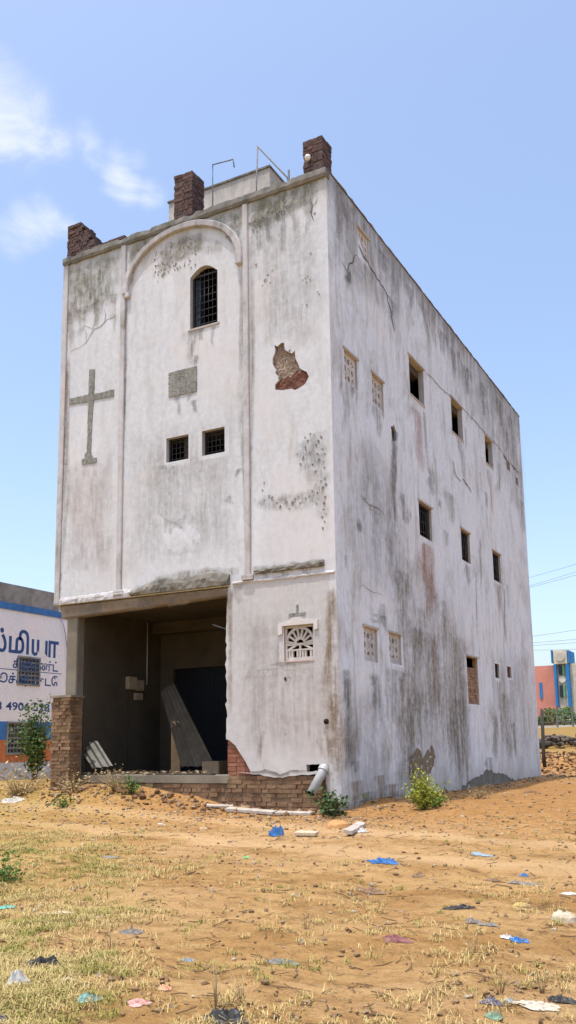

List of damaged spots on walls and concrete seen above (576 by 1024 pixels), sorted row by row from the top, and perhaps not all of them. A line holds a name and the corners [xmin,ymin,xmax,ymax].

leakage [70,260,110,310]
crack [342,245,395,331]
crack [72,309,115,351]
flaking render [274,344,309,390]
flaking render [228,741,257,775]
flaking render [409,745,435,789]
flaking render [462,769,514,789]